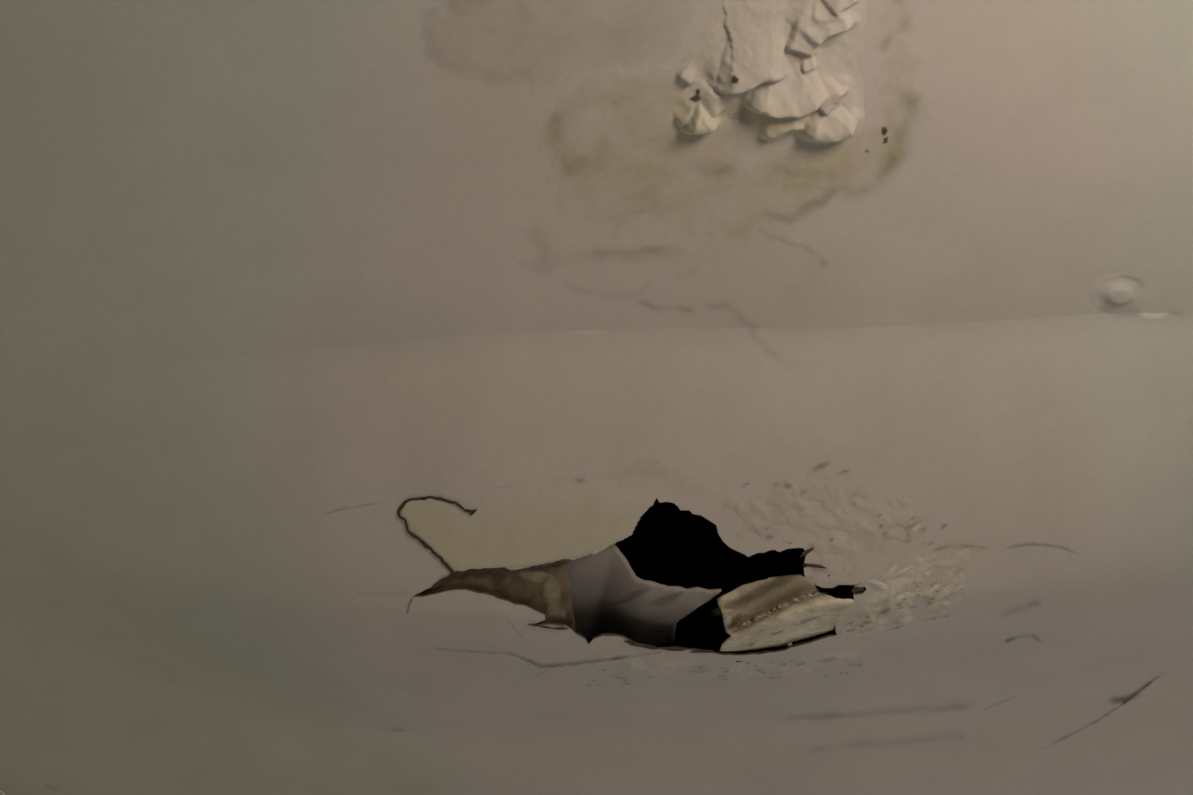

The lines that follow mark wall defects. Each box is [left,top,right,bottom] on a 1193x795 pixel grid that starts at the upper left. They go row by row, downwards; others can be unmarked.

leakage [420,0,936,277]
crack [397,496,477,607]
spalling [399,474,866,662]